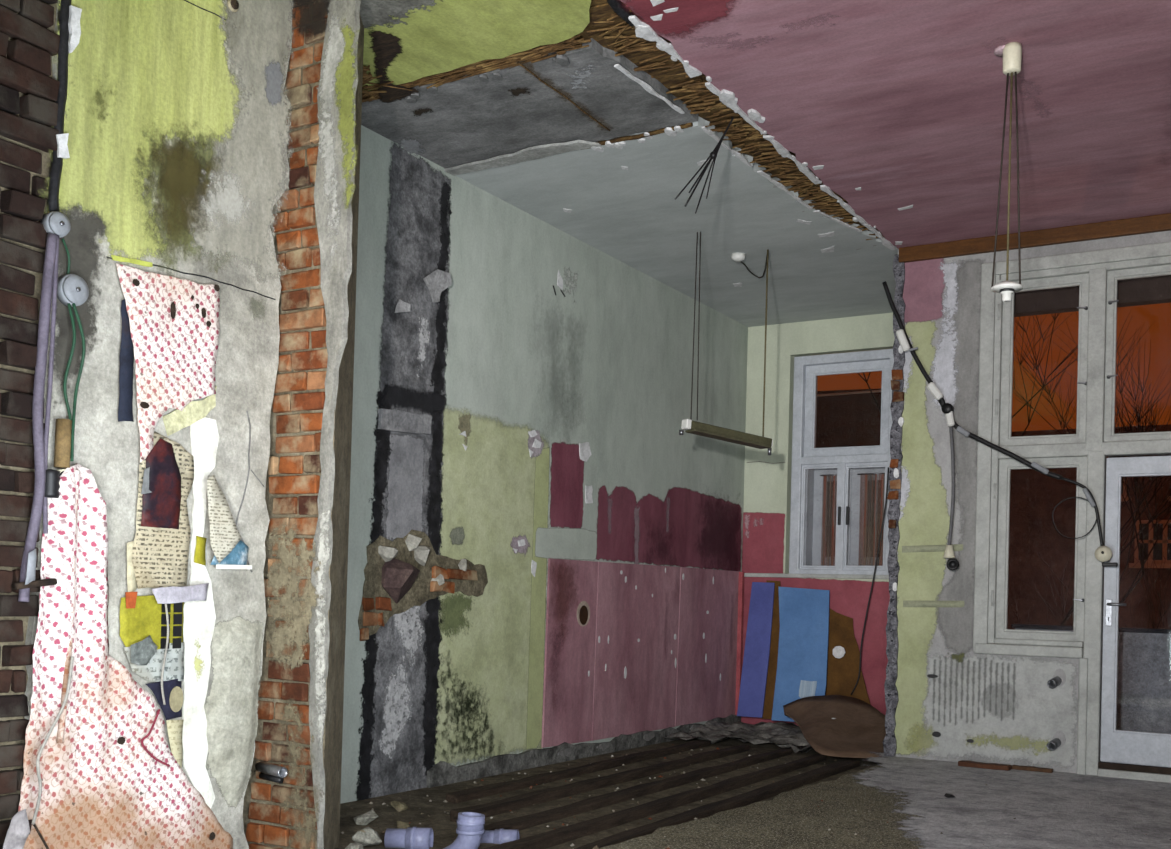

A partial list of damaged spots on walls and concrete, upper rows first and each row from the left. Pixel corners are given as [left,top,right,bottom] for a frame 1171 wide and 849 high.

peeling [0,0,328,849]
leakage [139,137,225,239]
leakage [435,662,494,760]
flaking render [358,0,913,757]